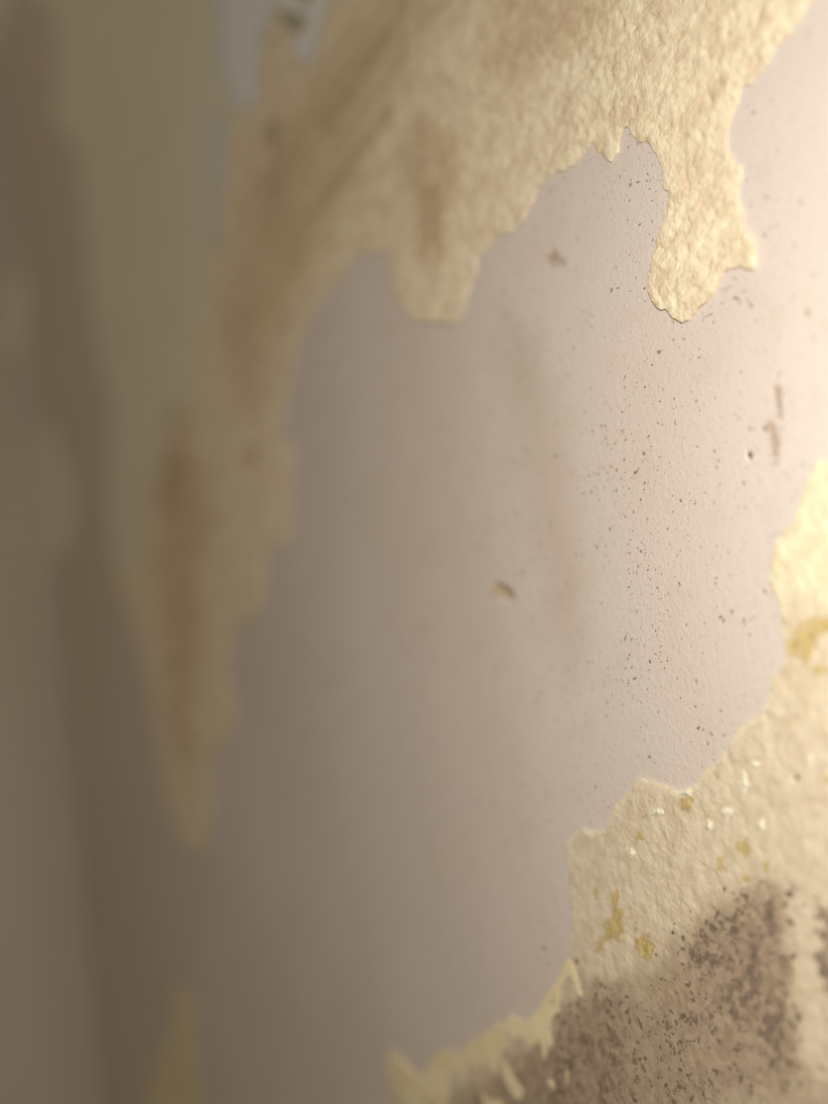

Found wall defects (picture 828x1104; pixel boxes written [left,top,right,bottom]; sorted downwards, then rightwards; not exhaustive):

peeling [42,0,813,854]
peeling [387,460,828,1104]
water stain [447,861,828,1104]